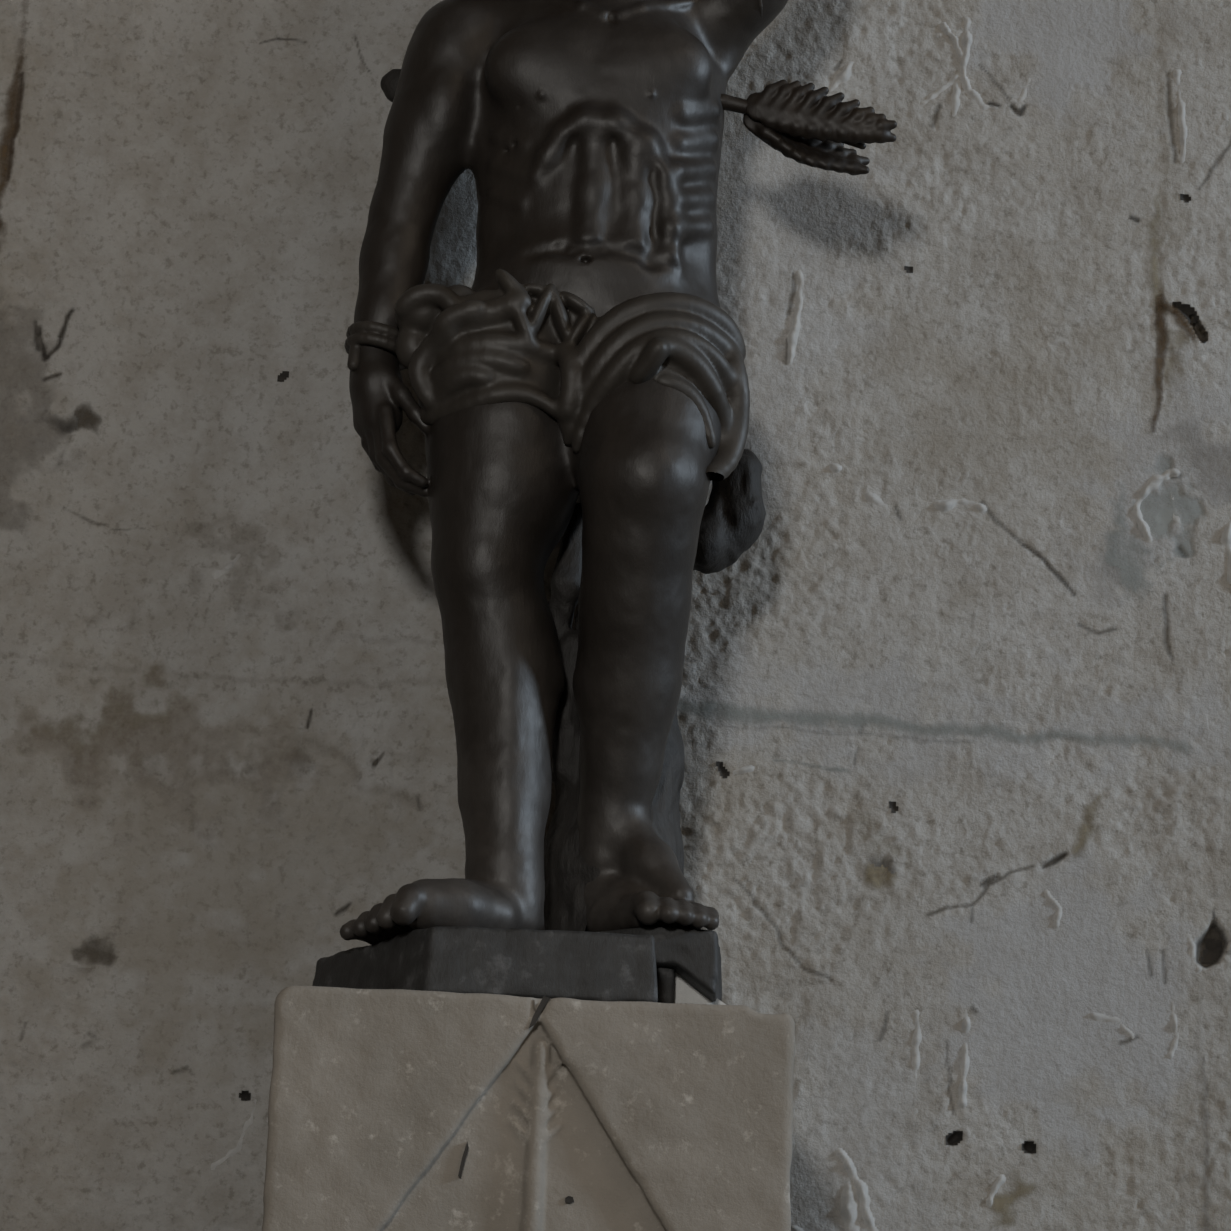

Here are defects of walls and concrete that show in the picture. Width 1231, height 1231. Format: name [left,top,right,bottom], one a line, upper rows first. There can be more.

spalling [1010,78,1031,116]
spalling [1132,460,1202,543]
spalling [1185,913,1226,973]